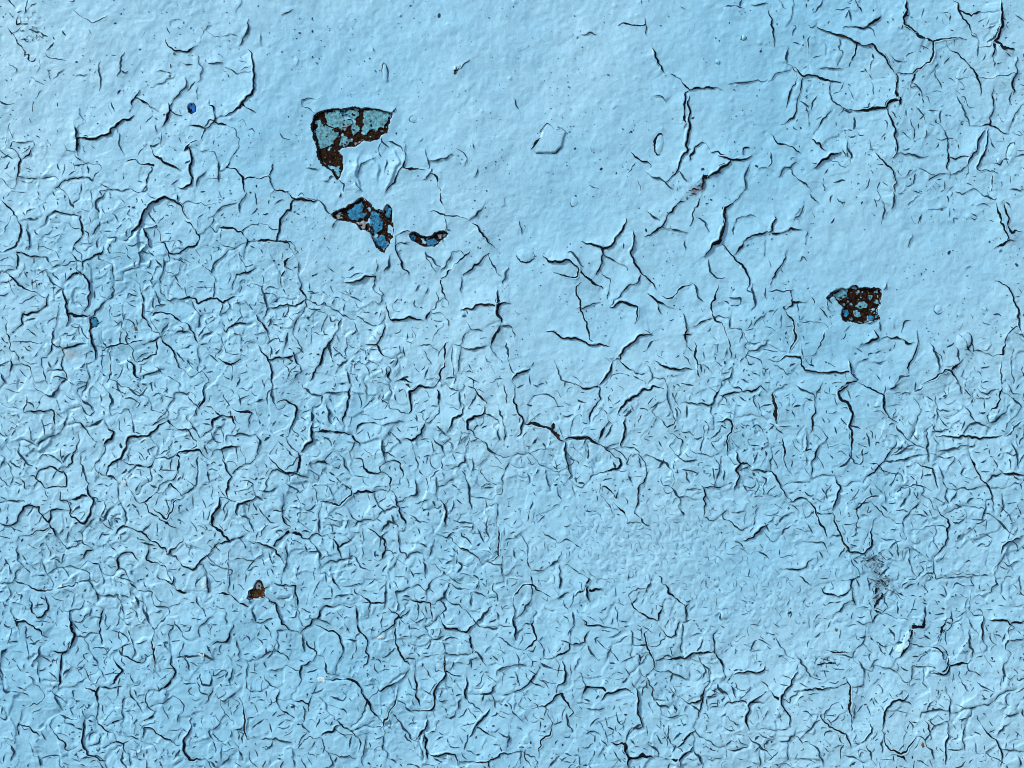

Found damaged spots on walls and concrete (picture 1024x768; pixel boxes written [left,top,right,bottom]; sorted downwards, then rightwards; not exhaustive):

crack [138,56,203,171]
peeling [310,106,393,180]
crack [358,138,467,203]
crack [644,48,808,310]
crack [726,0,1024,249]
peeling [331,197,394,253]
peeling [409,230,448,247]
crack [431,206,509,291]
crack [543,218,703,347]
crack [655,314,709,377]
peeling [826,285,882,324]
crack [954,281,1024,357]